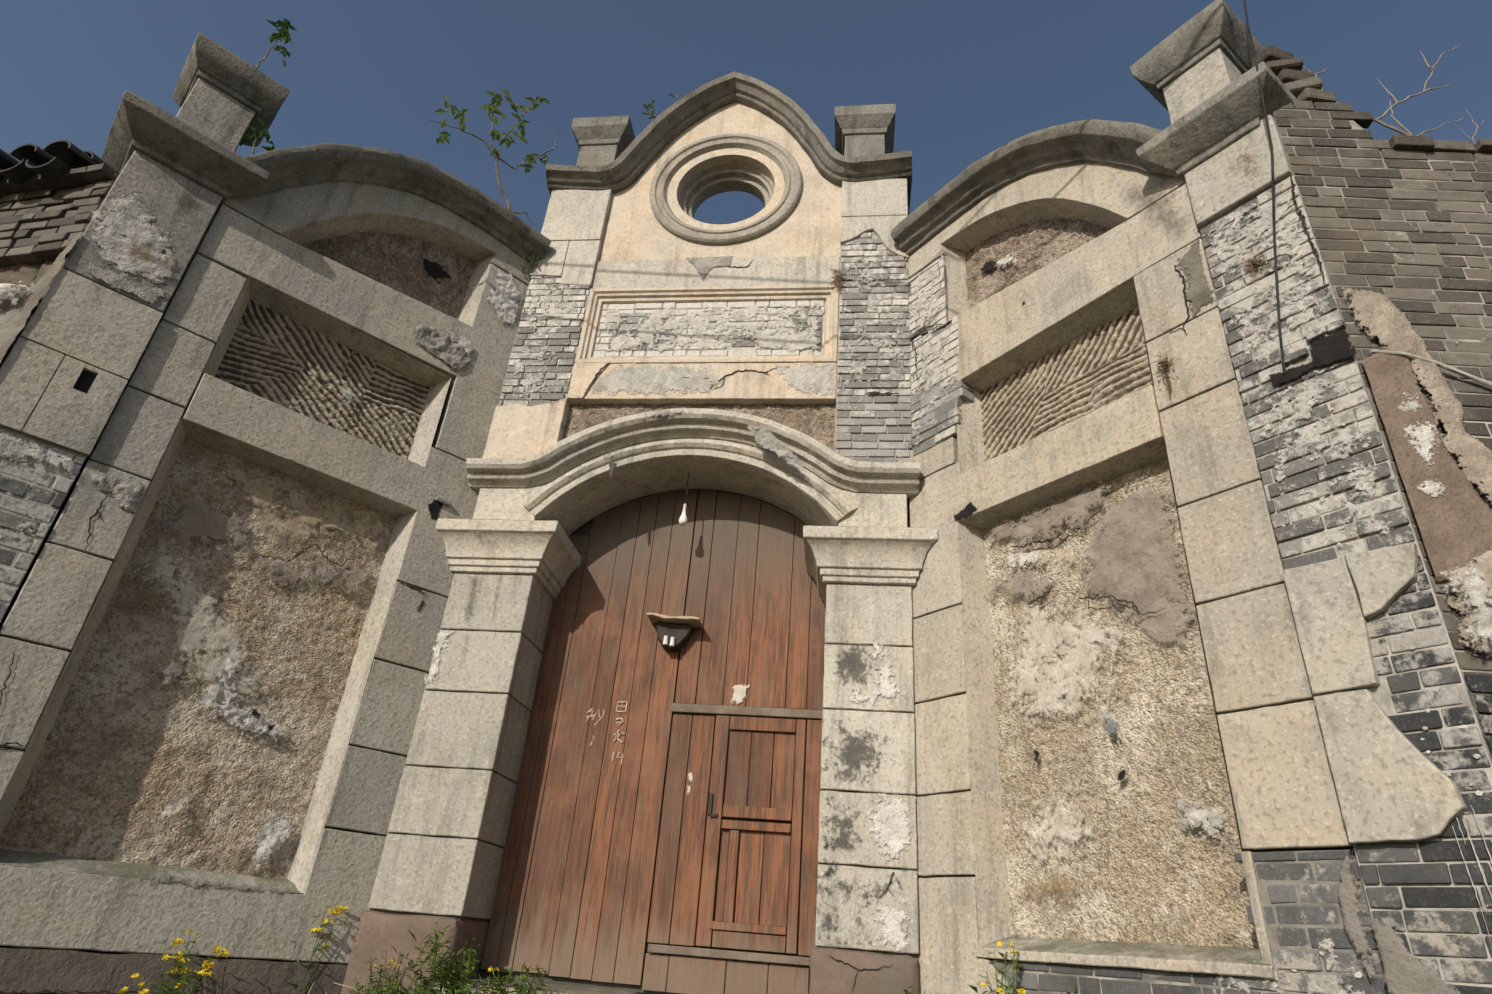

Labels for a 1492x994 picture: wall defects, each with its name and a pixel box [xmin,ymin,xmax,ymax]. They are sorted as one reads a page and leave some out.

flaking render [0,188,184,363]
crack [585,362,610,393]
crack [683,366,779,390]
corrosion [1159,356,1172,400]
spalling [0,429,145,621]
flaking render [131,458,385,740]
spalling [985,176,1492,994]
crack [0,655,14,705]
flaking render [849,642,903,710]
crack [0,742,26,750]
flaking render [866,790,920,864]
flaking render [868,899,911,951]